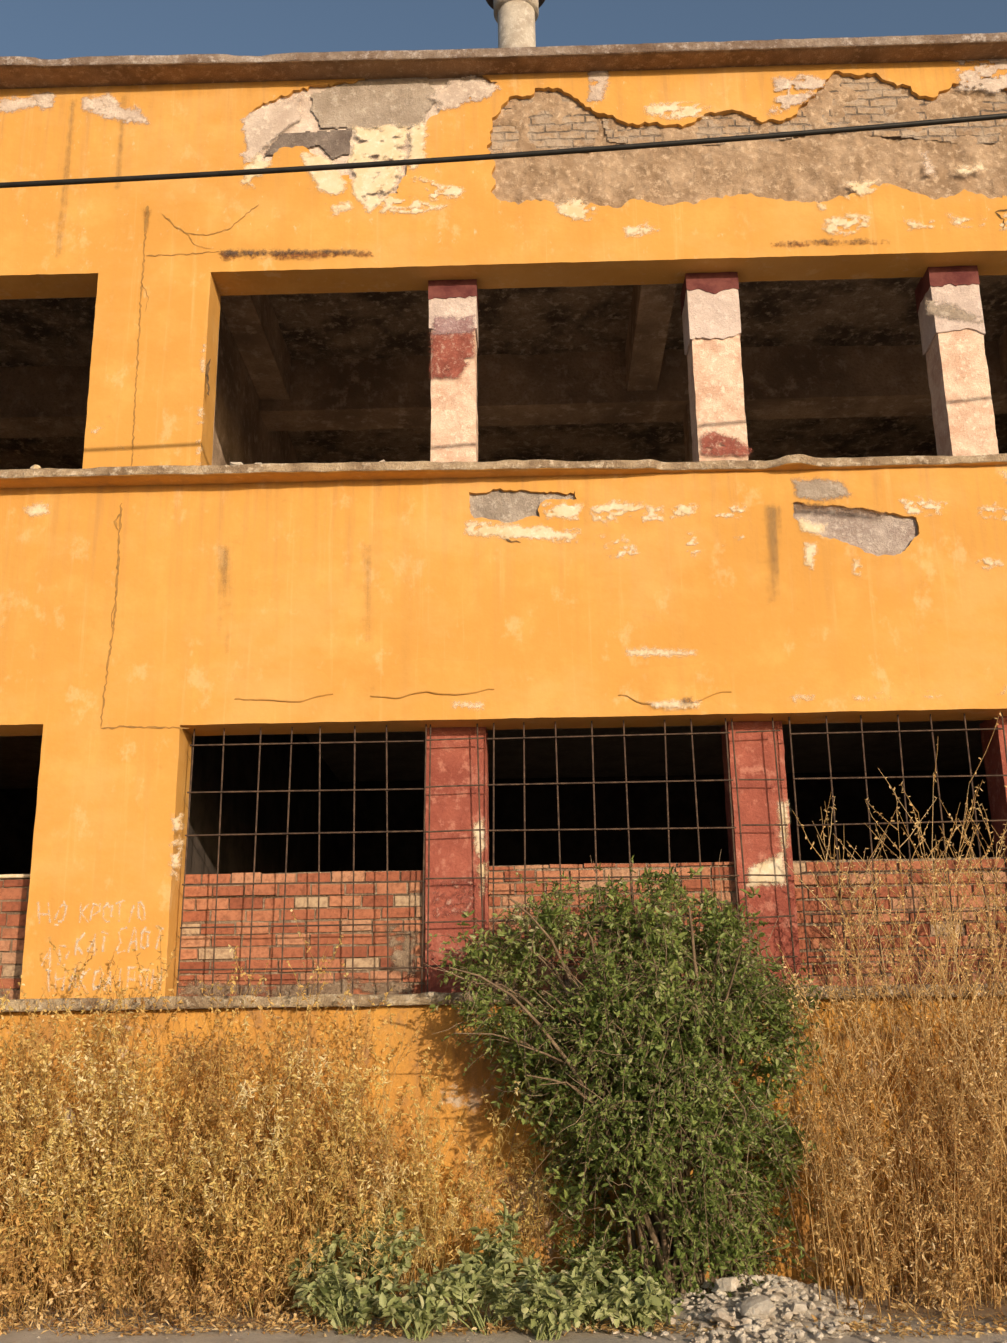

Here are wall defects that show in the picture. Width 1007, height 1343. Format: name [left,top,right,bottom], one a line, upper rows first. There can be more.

peeling [0,92,55,113]
peeling [82,93,148,124]
flaking render [241,59,1007,244]
crack [131,205,258,466]
flaking render [465,490,696,542]
flaking render [793,479,941,575]
crack [100,503,188,729]